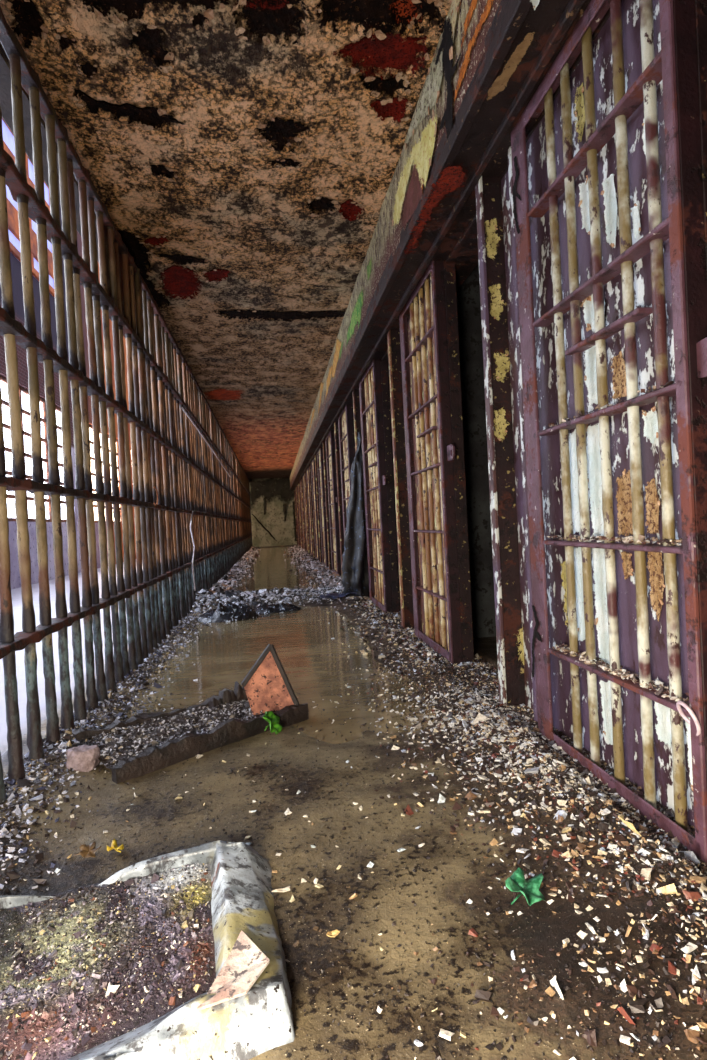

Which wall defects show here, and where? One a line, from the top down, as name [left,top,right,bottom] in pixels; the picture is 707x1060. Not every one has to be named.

flaking render [66,0,461,228]
flaking render [117,230,232,309]
peeling [580,294,606,332]
peeling [494,351,511,383]
peeling [584,345,598,406]
peeling [494,408,510,441]
peeling [642,406,658,444]
peeling [616,469,660,537]
peeling [560,422,610,667]
peeling [599,681,613,745]
peeling [654,701,672,747]
peeling [684,717,693,791]